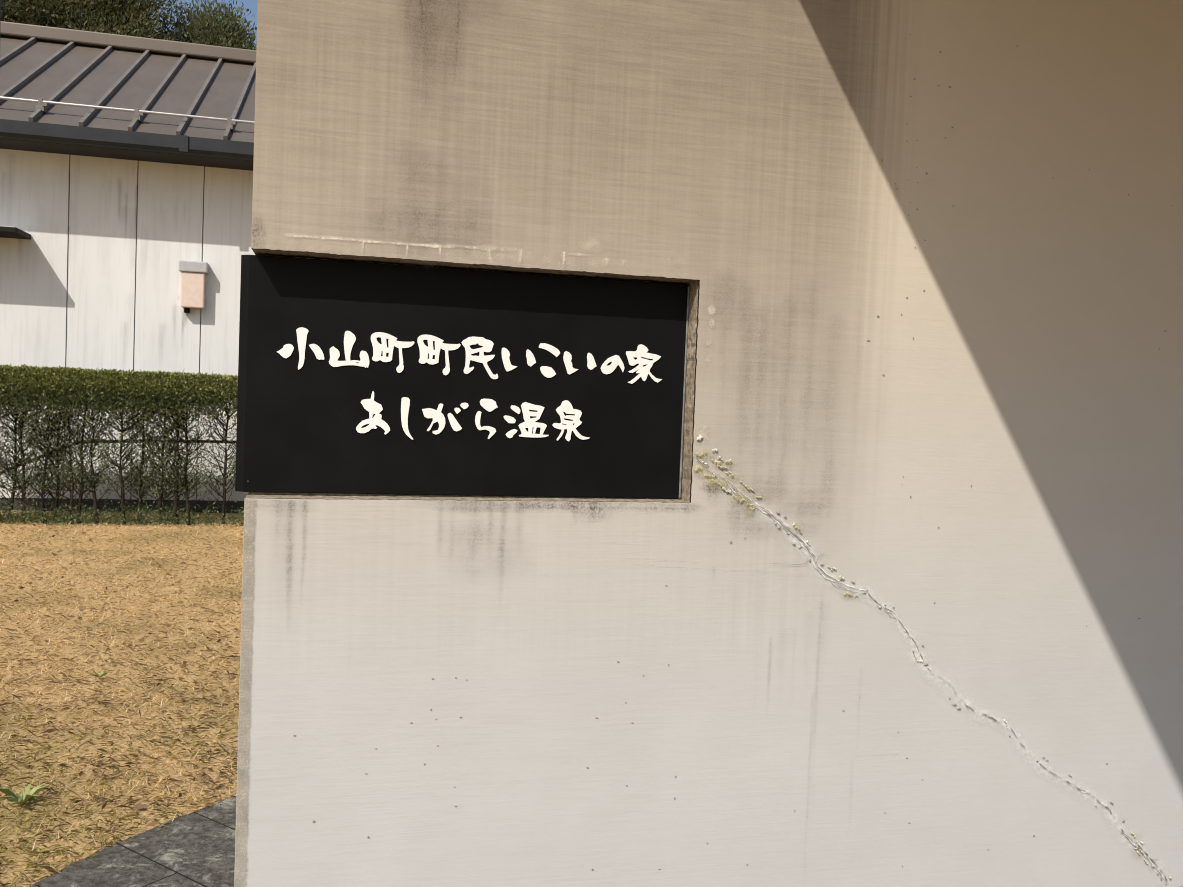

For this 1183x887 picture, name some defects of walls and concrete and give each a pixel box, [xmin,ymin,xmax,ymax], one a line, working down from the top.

leakage [287,234,504,260]
crack [694,435,1172,885]